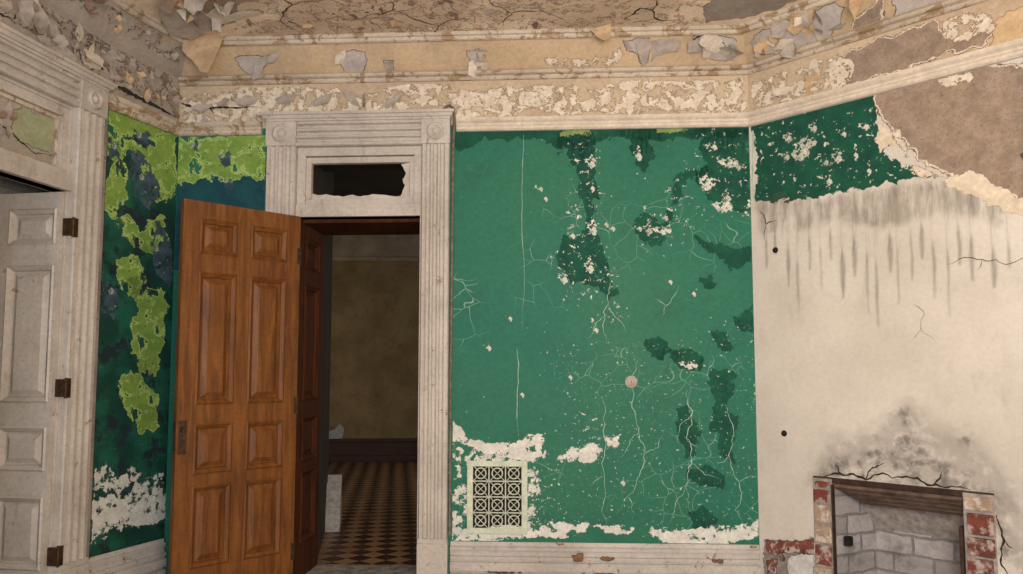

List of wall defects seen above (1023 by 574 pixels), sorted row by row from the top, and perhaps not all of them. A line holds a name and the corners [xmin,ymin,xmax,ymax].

peeling [0,0,1023,122]
peeling [0,100,58,156]
spalling [455,61,1023,333]
peeling [100,110,266,435]
peeling [709,304,754,361]
peeling [91,462,166,544]
peeling [452,336,815,574]
crack [590,360,747,527]
crack [824,462,971,491]